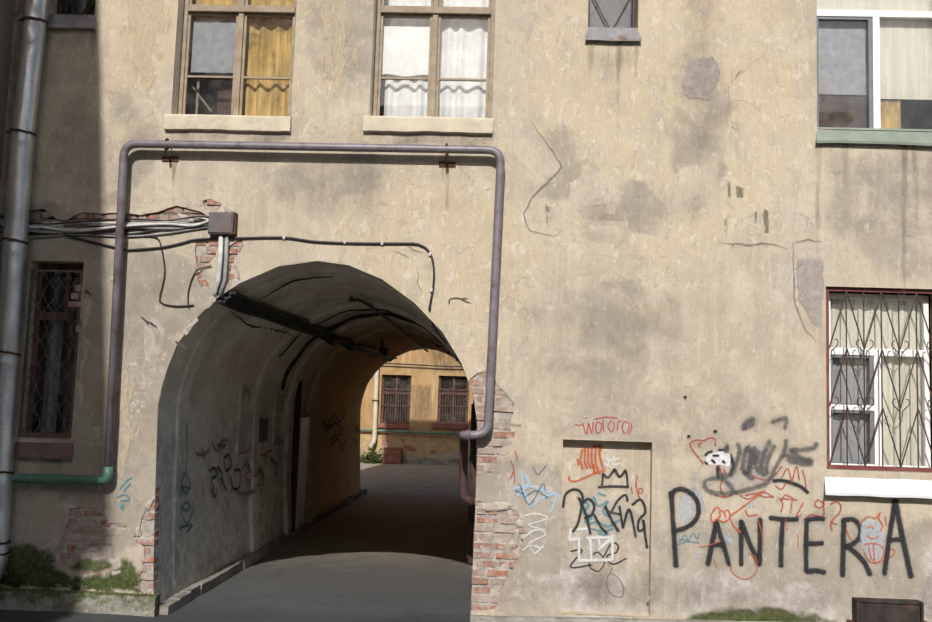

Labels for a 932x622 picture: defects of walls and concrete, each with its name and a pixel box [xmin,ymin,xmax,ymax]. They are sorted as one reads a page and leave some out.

spalling [28,199,236,236]
crack [523,123,562,236]
spalling [196,240,251,309]
flaking render [68,285,93,409]
spalling [54,486,160,593]
spalling [401,371,536,616]